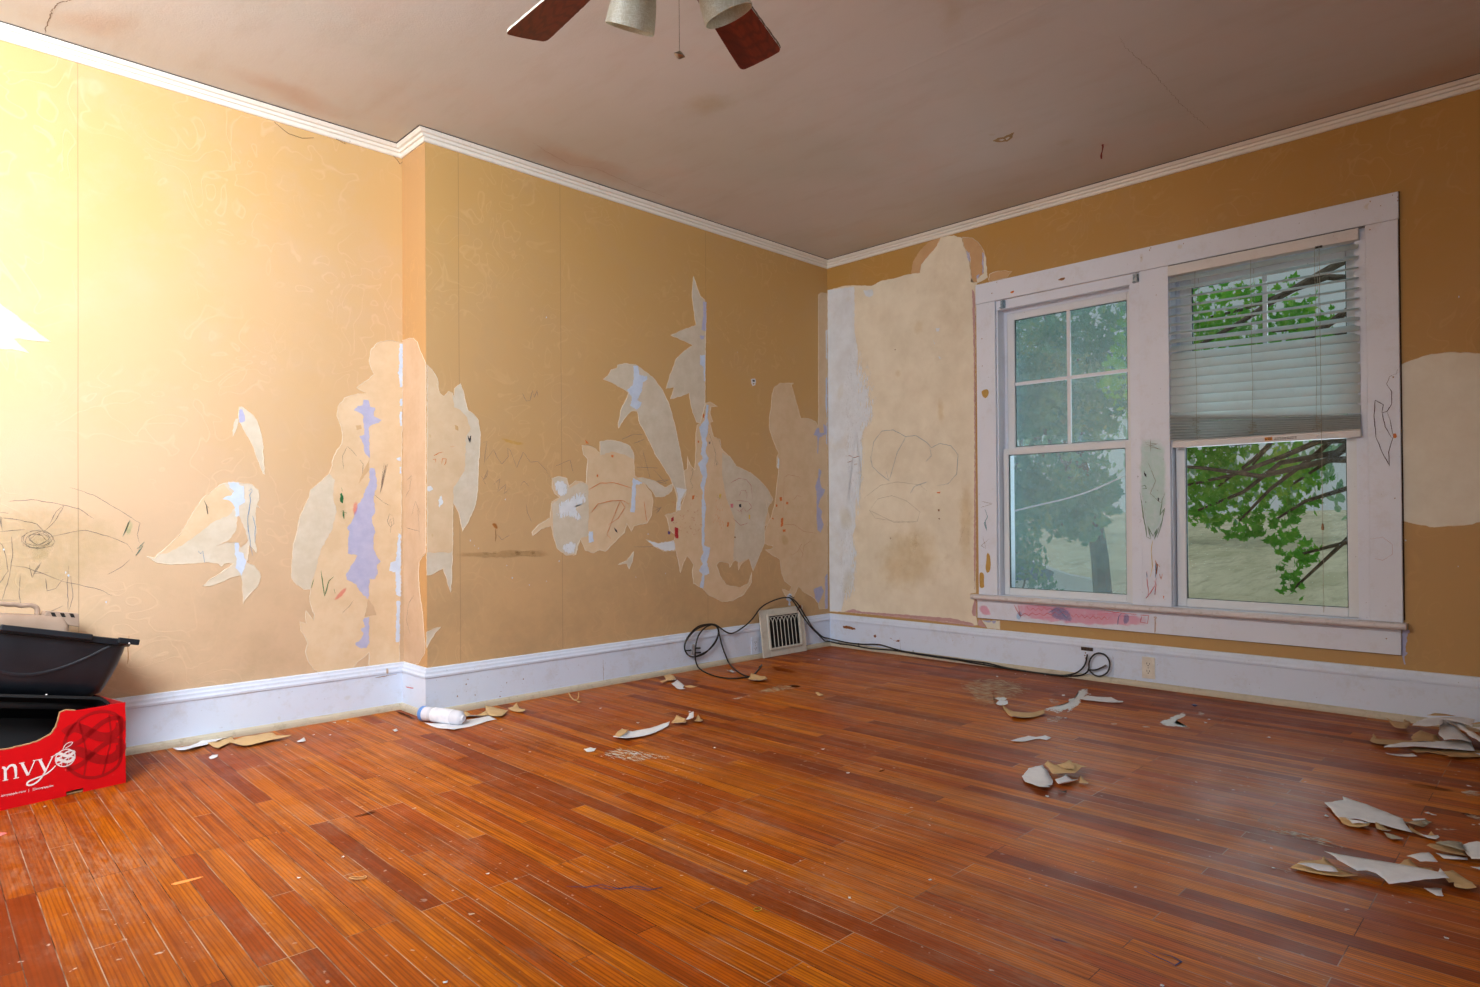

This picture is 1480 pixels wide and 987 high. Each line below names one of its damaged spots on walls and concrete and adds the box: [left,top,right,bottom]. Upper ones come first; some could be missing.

peeling [966,251,988,283]
peeling [627,366,647,410]
peeling [814,377,828,533]
peeling [223,482,245,517]
peeling [630,478,642,512]
peeling [676,404,710,588]
peeling [346,400,401,642]
peeling [234,543,246,576]
peeling [649,540,675,551]
peeling [355,617,370,648]